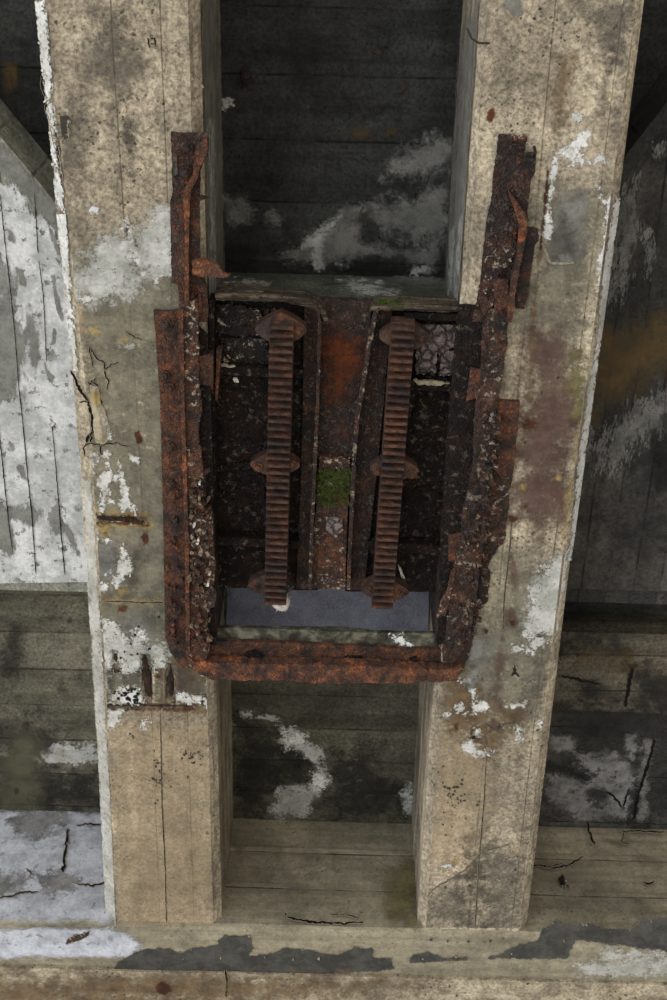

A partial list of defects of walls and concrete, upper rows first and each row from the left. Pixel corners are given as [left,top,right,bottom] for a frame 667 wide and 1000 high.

damp [281,0,478,303]
crack [70,346,129,457]
damp [443,62,667,824]
damp [0,142,207,959]
rust [165,479,213,651]
rust [156,620,206,713]
rust [445,501,526,758]
crack [0,868,39,899]
spalling [66,932,89,944]
crack [60,822,105,887]
peeling [114,934,395,974]
peeling [484,917,667,960]